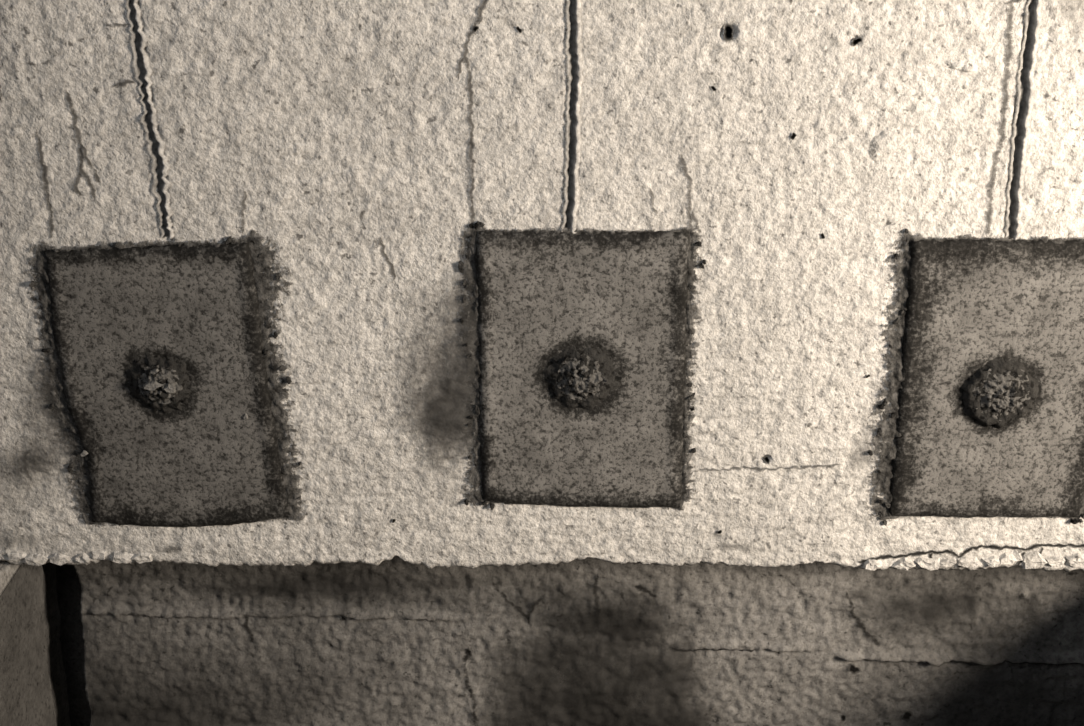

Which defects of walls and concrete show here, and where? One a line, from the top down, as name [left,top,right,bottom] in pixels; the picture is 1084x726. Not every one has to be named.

crack [106,0,175,239]
crack [457,0,489,224]
crack [561,0,584,234]
crack [986,0,1043,239]
crack [846,593,880,645]
crack [859,543,1084,568]